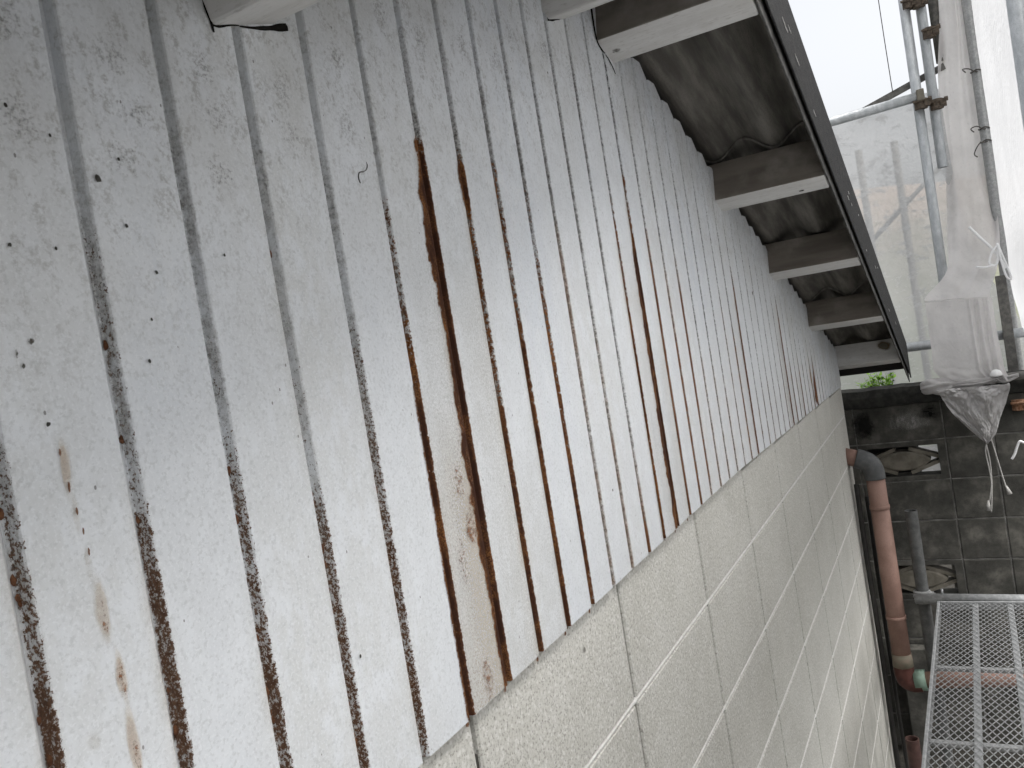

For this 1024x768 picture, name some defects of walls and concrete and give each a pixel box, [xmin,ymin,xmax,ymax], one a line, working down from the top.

rust [0,444,67,768]
rust [84,233,194,768]
rust [208,336,294,768]
rust [310,462,370,768]
rust [382,136,513,727]
rust [457,150,544,662]
rust [532,235,595,613]
rust [637,482,651,552]
rust [610,175,730,538]